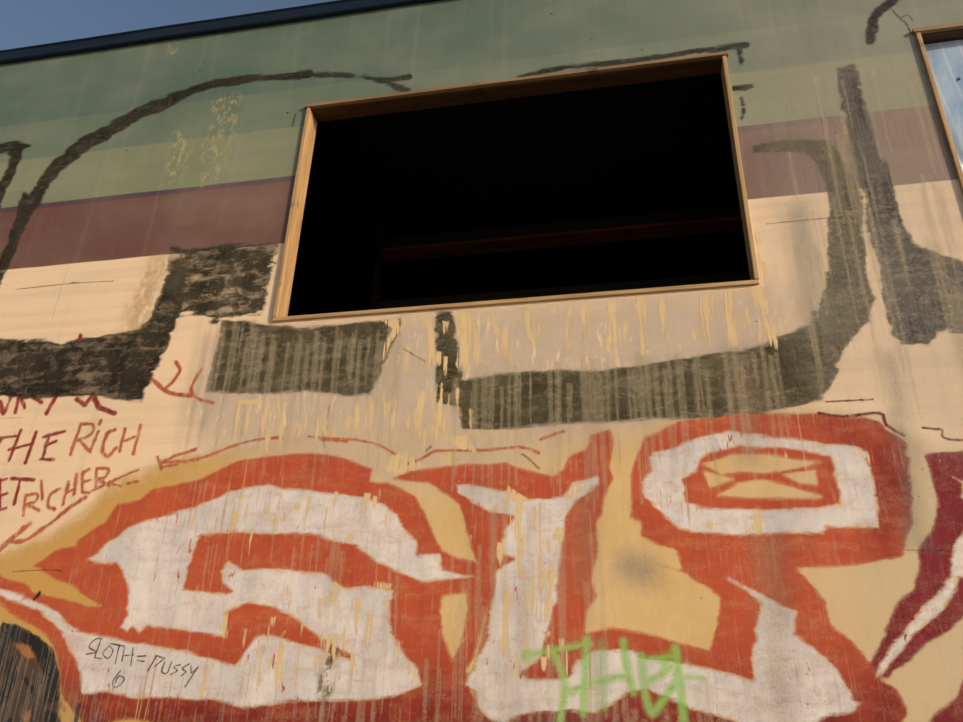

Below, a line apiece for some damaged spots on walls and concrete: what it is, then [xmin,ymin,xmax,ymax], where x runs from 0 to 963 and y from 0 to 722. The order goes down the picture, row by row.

peeling [603,297,679,359]
peeling [690,229,778,349]
peeling [217,392,330,454]
peeling [344,309,544,475]